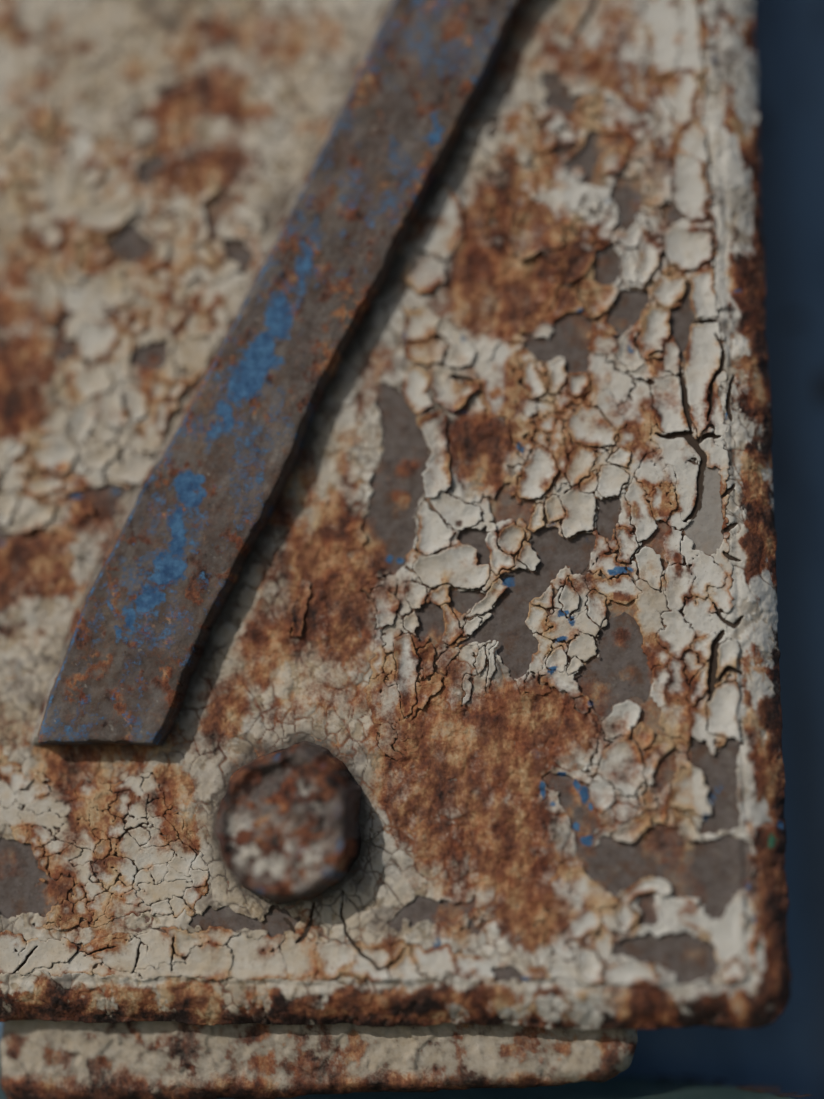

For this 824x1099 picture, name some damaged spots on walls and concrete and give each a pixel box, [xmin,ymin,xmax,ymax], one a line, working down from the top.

corrosion [128,0,337,192]
peeling [0,102,265,552]
corrosion [185,342,400,759]
corrosion [0,978,590,1029]
crack [283,901,410,971]
peeling [0,485,753,986]
corrosion [363,653,602,955]
peeling [361,0,734,761]
corrosion [591,83,792,1030]
crack [655,319,735,523]
crack [707,603,743,701]
crack [721,523,741,562]